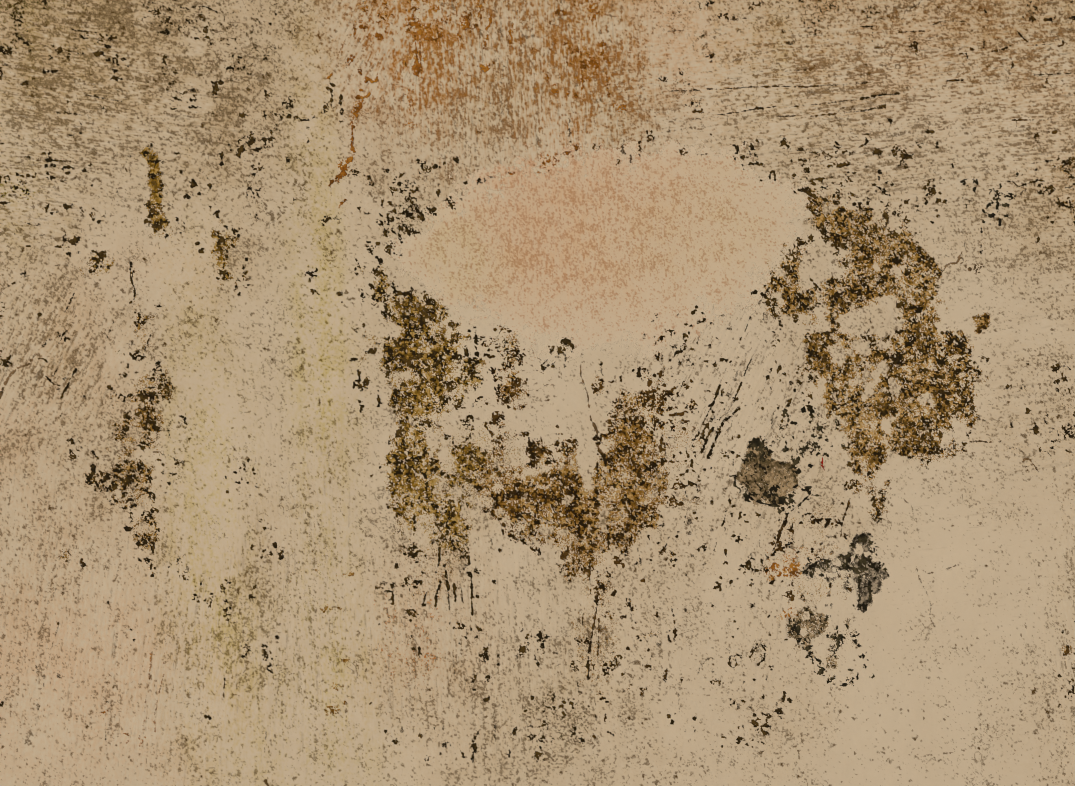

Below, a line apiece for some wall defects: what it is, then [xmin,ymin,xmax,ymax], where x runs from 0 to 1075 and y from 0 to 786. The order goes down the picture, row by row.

leakage [0,0,129,86]
leakage [142,0,344,224]
corrosion [328,0,493,186]
corrosion [525,0,627,112]
leakage [718,82,900,124]
leakage [130,143,212,239]
leakage [960,156,1075,254]
leakage [55,232,235,623]
leakage [350,129,990,765]
spalling [729,436,819,515]
leakage [1025,358,1075,455]
spalling [786,532,889,687]